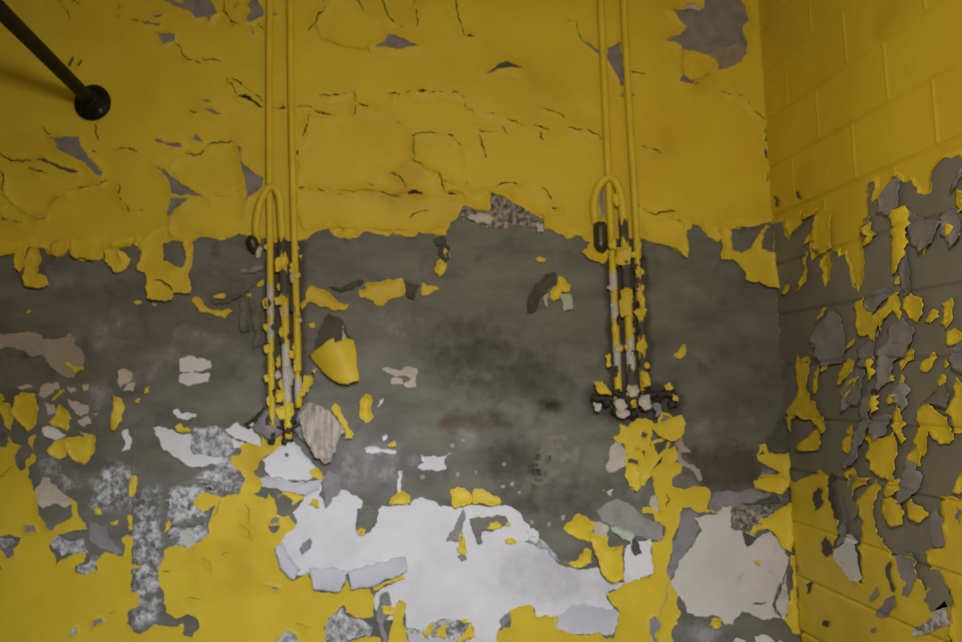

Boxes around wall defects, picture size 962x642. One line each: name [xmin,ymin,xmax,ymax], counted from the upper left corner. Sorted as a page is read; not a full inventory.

peeling [151,0,283,39]
crack [306,0,418,49]
crack [447,0,481,41]
peeling [567,20,645,102]
peeling [654,0,755,89]
crack [182,58,601,232]
crack [639,205,681,222]
peeling [0,138,962,642]